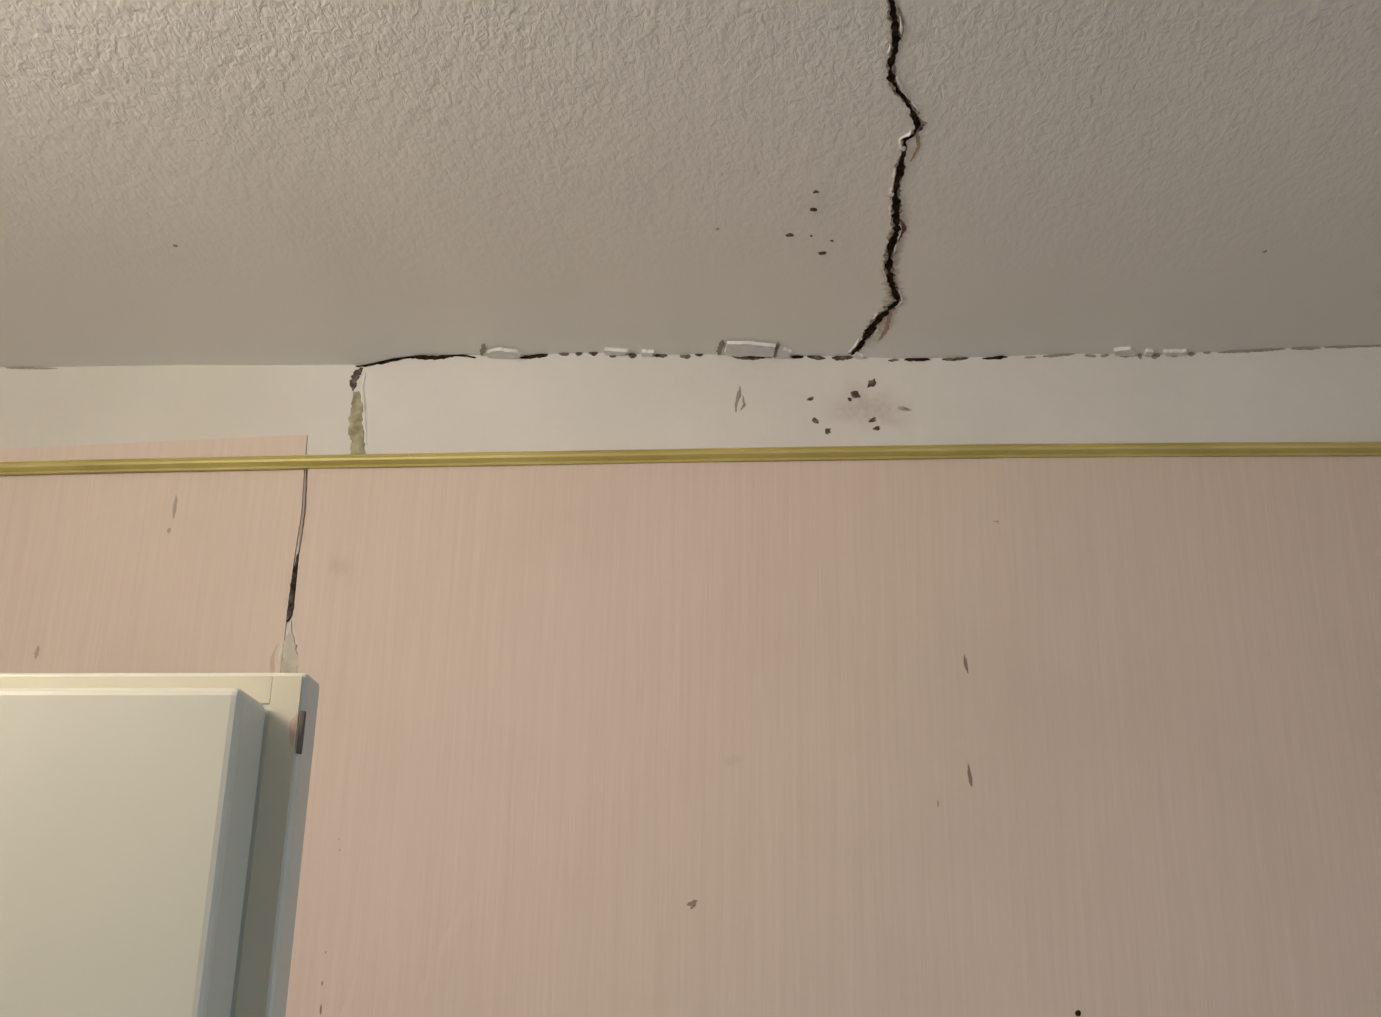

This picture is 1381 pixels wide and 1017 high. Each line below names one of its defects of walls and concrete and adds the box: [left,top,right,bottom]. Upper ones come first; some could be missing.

crack [348,0,1381,454]
crack [270,469,307,673]